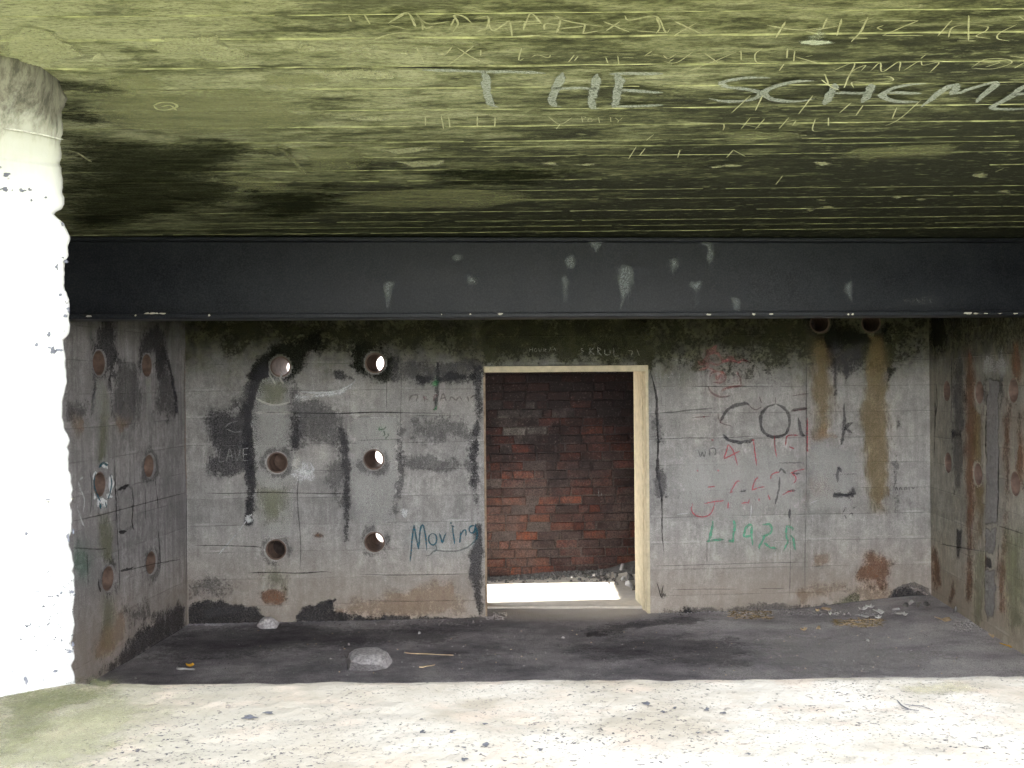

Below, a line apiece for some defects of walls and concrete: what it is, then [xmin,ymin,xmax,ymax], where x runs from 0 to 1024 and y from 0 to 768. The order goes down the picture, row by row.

water stain [60,81,344,233]
water stain [66,321,186,427]
water stain [203,333,485,620]
rust [807,318,889,512]
rust [932,348,984,603]
rust [1003,398,1024,498]
rust [857,551,894,589]